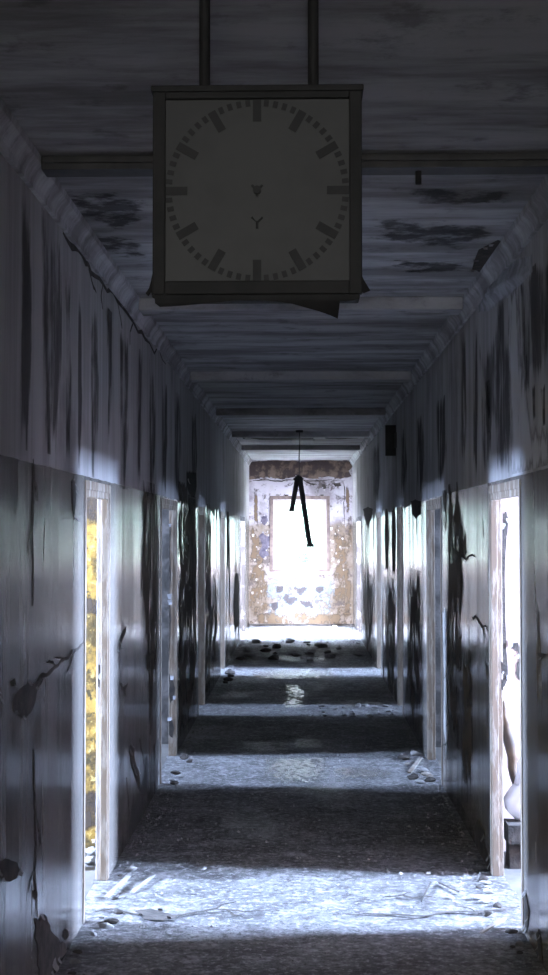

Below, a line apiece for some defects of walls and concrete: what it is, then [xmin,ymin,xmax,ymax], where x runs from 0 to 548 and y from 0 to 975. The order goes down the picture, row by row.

water stain [401,421,424,492]
water stain [21,210,197,844]
peeling [227,511,239,633]
peeling [251,515,335,617]
water stain [437,395,472,787]